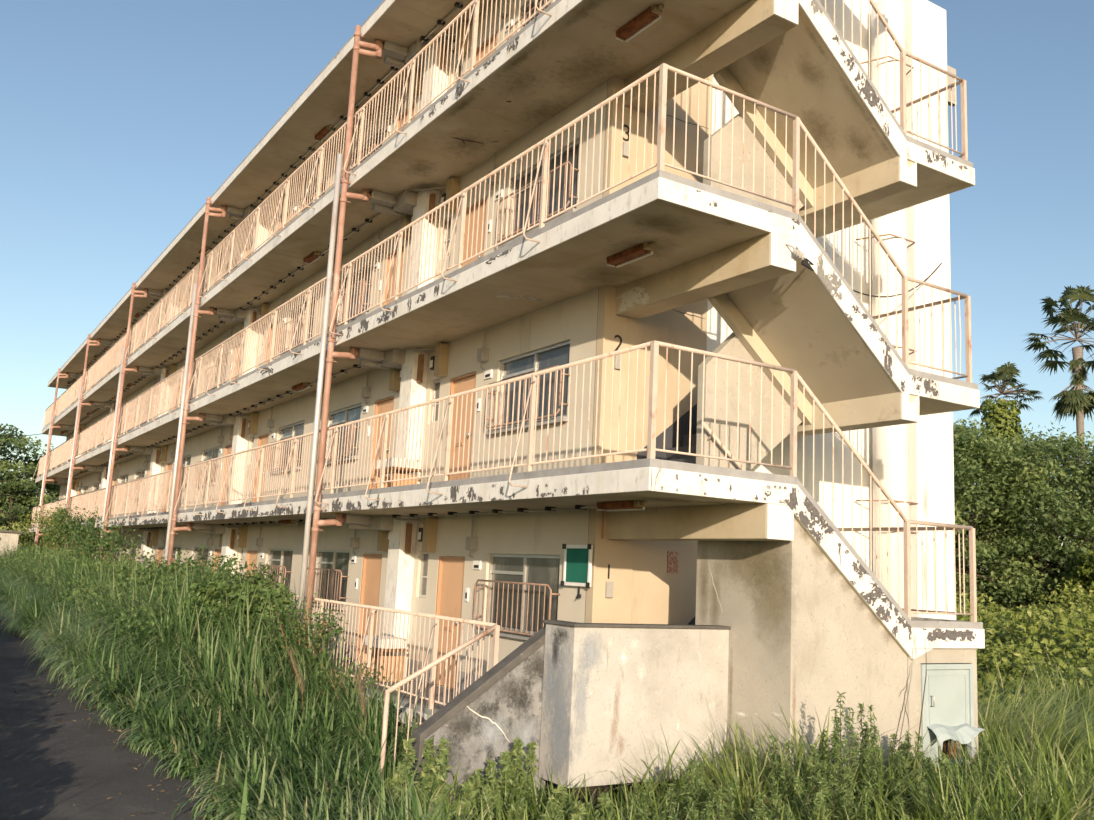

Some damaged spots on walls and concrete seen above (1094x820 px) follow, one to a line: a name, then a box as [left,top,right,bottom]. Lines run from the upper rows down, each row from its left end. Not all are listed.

peeling [475,36,519,76]
peeling [421,81,465,119]
peeling [832,35,890,136]
peeling [925,150,968,169]
peeling [335,284,439,339]
peeling [817,254,939,397]
peeling [536,484,588,497]
peeling [755,485,976,642]
crack [466,706,510,742]